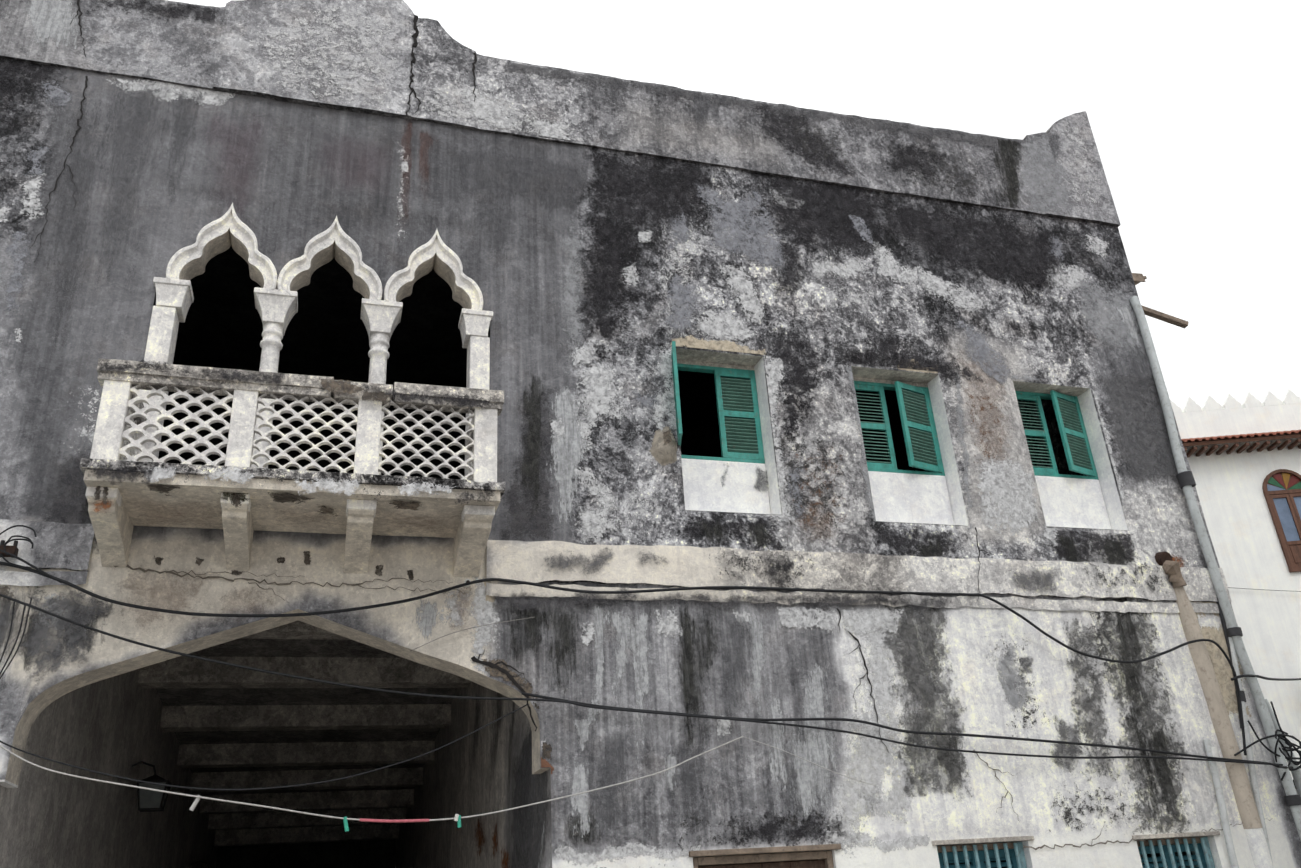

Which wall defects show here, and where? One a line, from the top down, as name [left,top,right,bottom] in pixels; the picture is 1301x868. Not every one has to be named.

crack [30,0,88,262]
leakage [98,360,284,384]
leakage [363,385,492,408]
leakage [455,152,732,539]
leakage [754,468,768,491]
leakage [504,62,1190,481]
leakage [1052,530,1138,565]
leakage [494,514,972,868]
crack [843,626,889,753]
leakage [1047,597,1190,840]